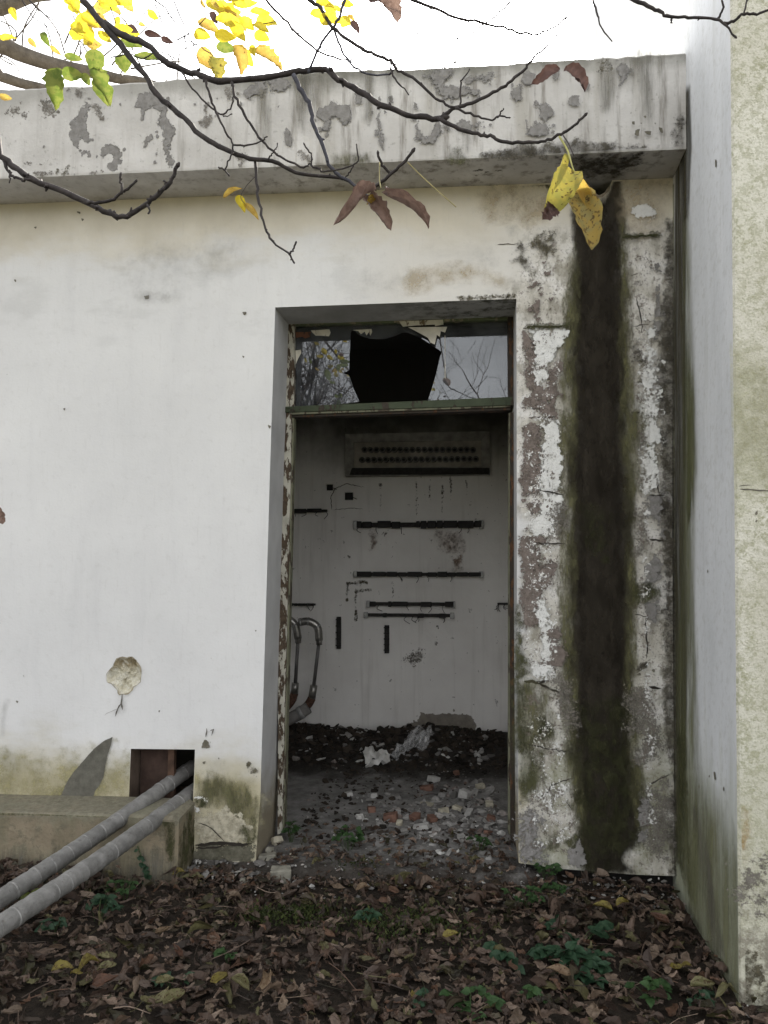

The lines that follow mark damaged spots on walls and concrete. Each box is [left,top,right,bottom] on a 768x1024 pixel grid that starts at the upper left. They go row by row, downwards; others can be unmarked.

peeling [66,85,126,172]
peeling [134,92,176,168]
peeling [194,78,291,128]
peeling [314,93,357,137]
peeling [372,96,393,150]
peeling [411,102,492,144]
peeling [422,60,494,104]
peeling [511,83,556,138]
water stain [596,58,613,106]
peeling [518,330,564,516]
water stain [480,90,721,955]
peeling [518,536,569,670]